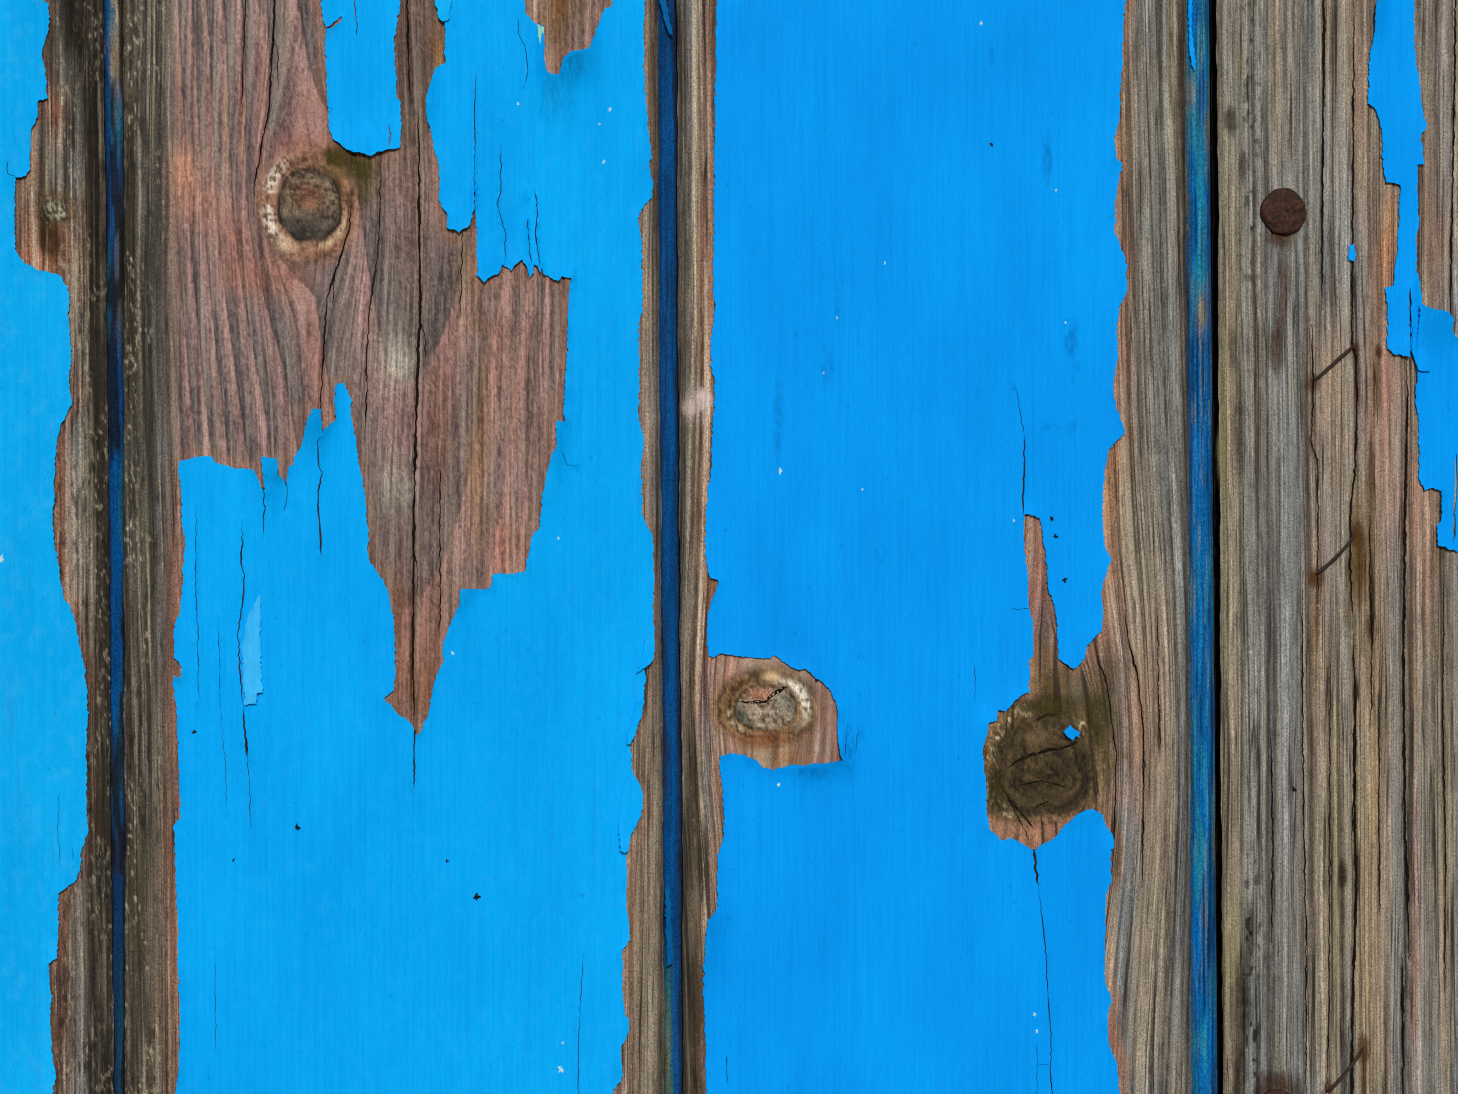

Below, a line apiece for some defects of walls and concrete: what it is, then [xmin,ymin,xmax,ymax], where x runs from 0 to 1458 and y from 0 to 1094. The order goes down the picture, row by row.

peeling [14,0,571,1094]
peeling [524,0,613,74]
peeling [613,0,842,1094]
crack [1000,713,1078,1094]
peeling [982,0,1196,1094]
crack [1094,617,1161,880]
peeling [1348,244,1356,262]
peeling [1367,0,1458,552]